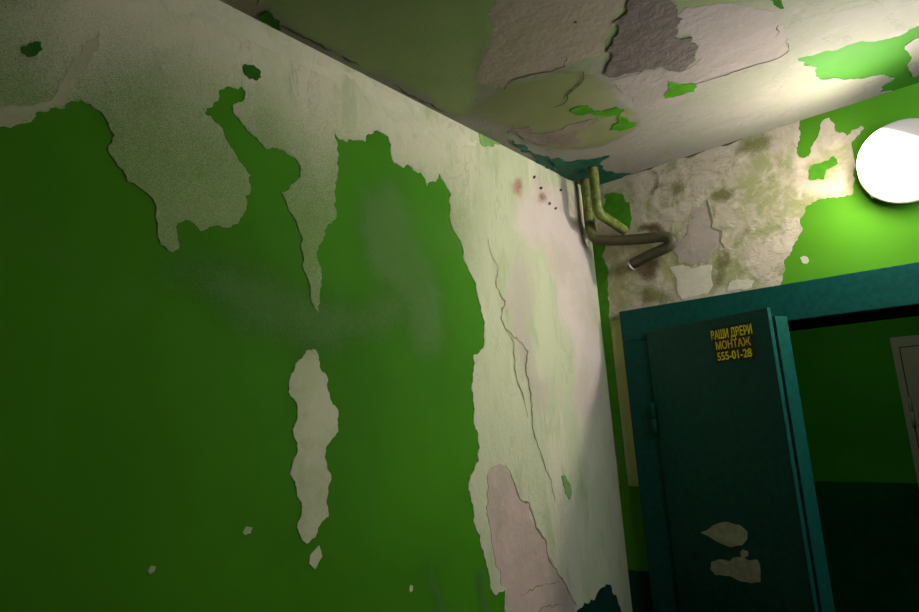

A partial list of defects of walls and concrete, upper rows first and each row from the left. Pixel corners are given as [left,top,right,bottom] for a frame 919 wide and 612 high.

peeling [220,0,919,174]
peeling [0,0,632,612]
crack [488,239,555,498]
peeling [592,118,864,486]
crack [505,465,577,612]